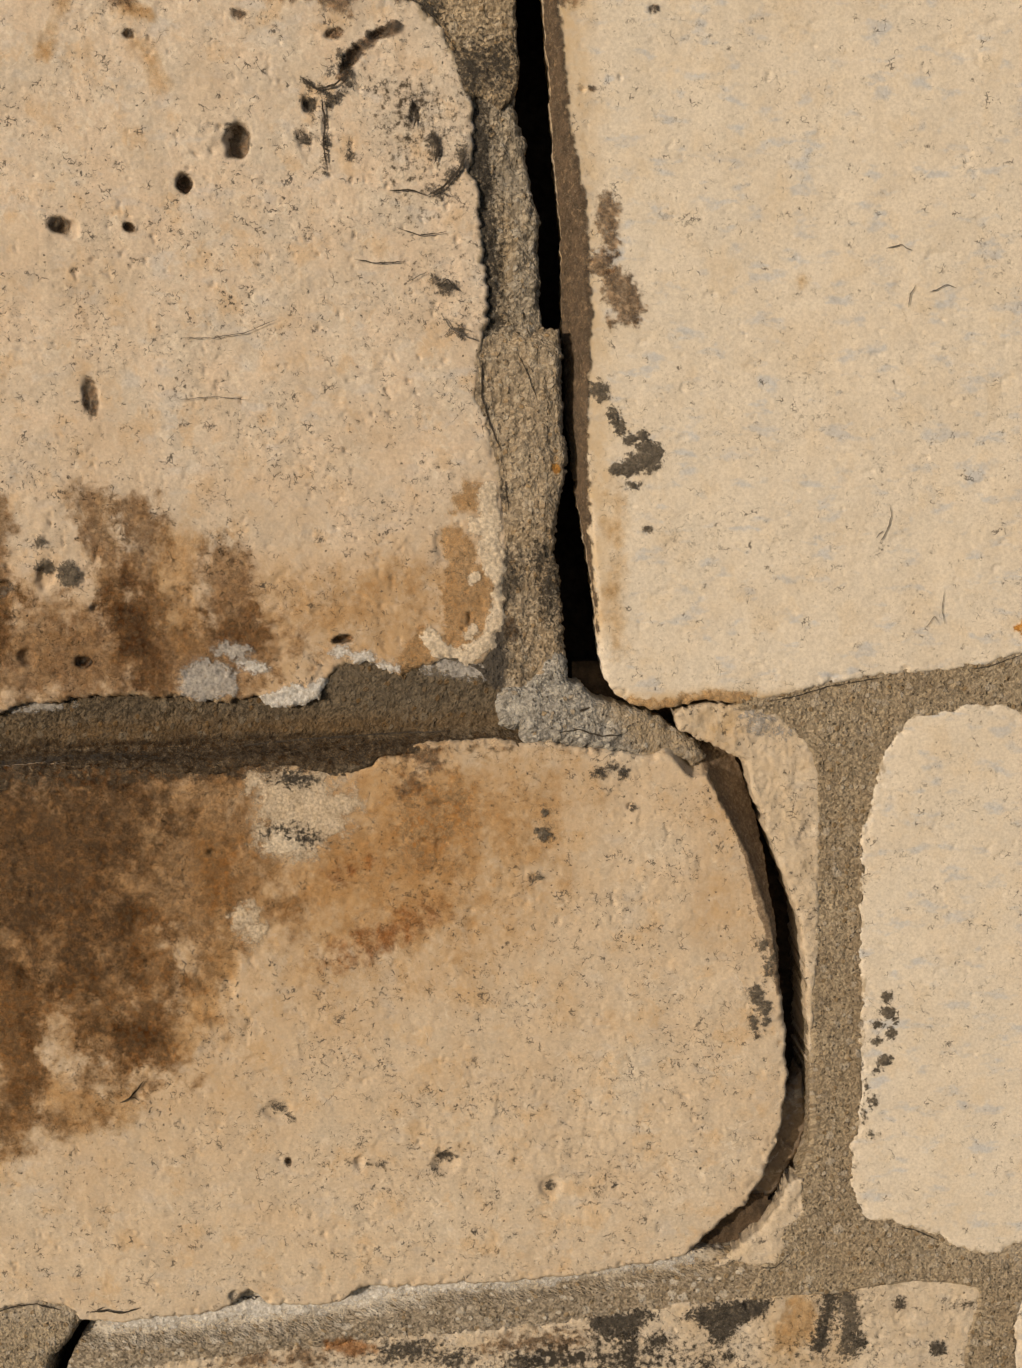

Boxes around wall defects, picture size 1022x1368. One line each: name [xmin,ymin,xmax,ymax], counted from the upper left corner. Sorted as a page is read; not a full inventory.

crack [301,74,346,170]
crack [355,228,501,449]
crack [514,0,675,737]
damp [178,639,268,702]
damp [260,678,329,708]
damp [328,644,400,673]
damp [419,659,502,682]
damp [589,762,631,780]
crack [735,756,794,1067]
damp [431,1147,458,1175]
crack [671,1157,794,1260]
crack [0,1303,139,1368]